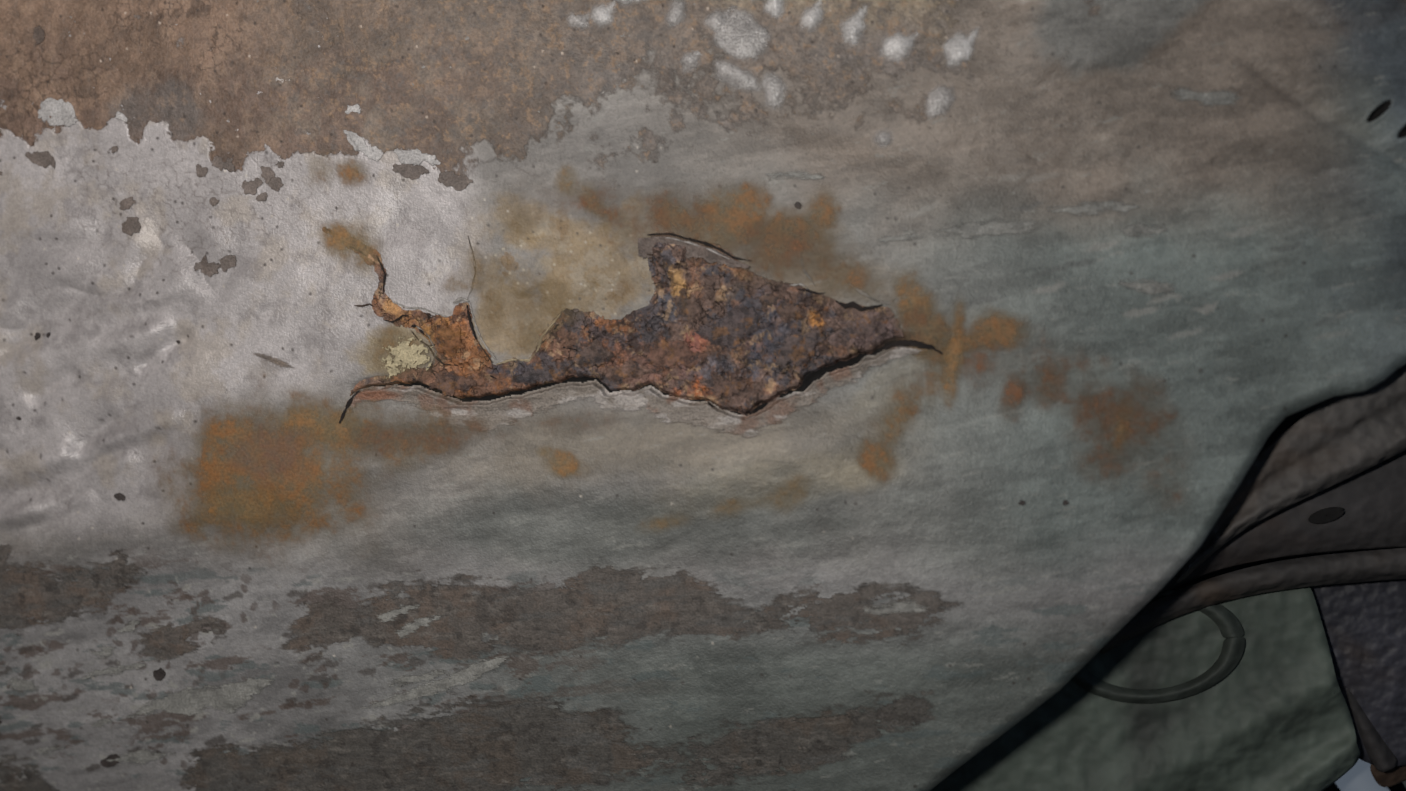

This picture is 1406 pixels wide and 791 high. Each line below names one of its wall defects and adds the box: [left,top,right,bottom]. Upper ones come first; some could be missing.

peeling [119,197,141,236]
peeling [193,255,237,277]
crack [322,227,945,438]
corrosion [896,277,1020,395]
corrosion [183,395,446,539]
corrosion [860,391,909,479]